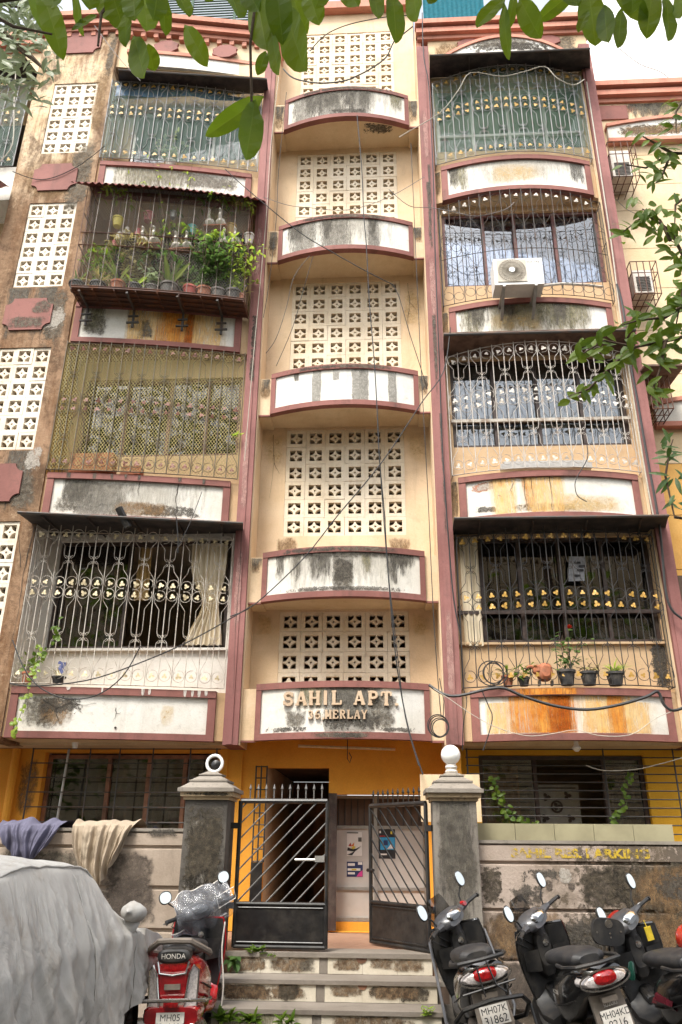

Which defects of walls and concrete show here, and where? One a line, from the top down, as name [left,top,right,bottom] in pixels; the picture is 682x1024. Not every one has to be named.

damp [276,86,417,134]
damp [269,214,384,256]
corrosion [127,310,221,346]
damp [419,303,589,394]
damp [56,472,202,518]
corrosion [493,477,563,514]
damp [276,538,413,593]
damp [23,696,83,726]
corrosion [487,688,651,734]
damp [148,806,224,916]
damp [103,852,153,922]
damp [485,913,533,1012]